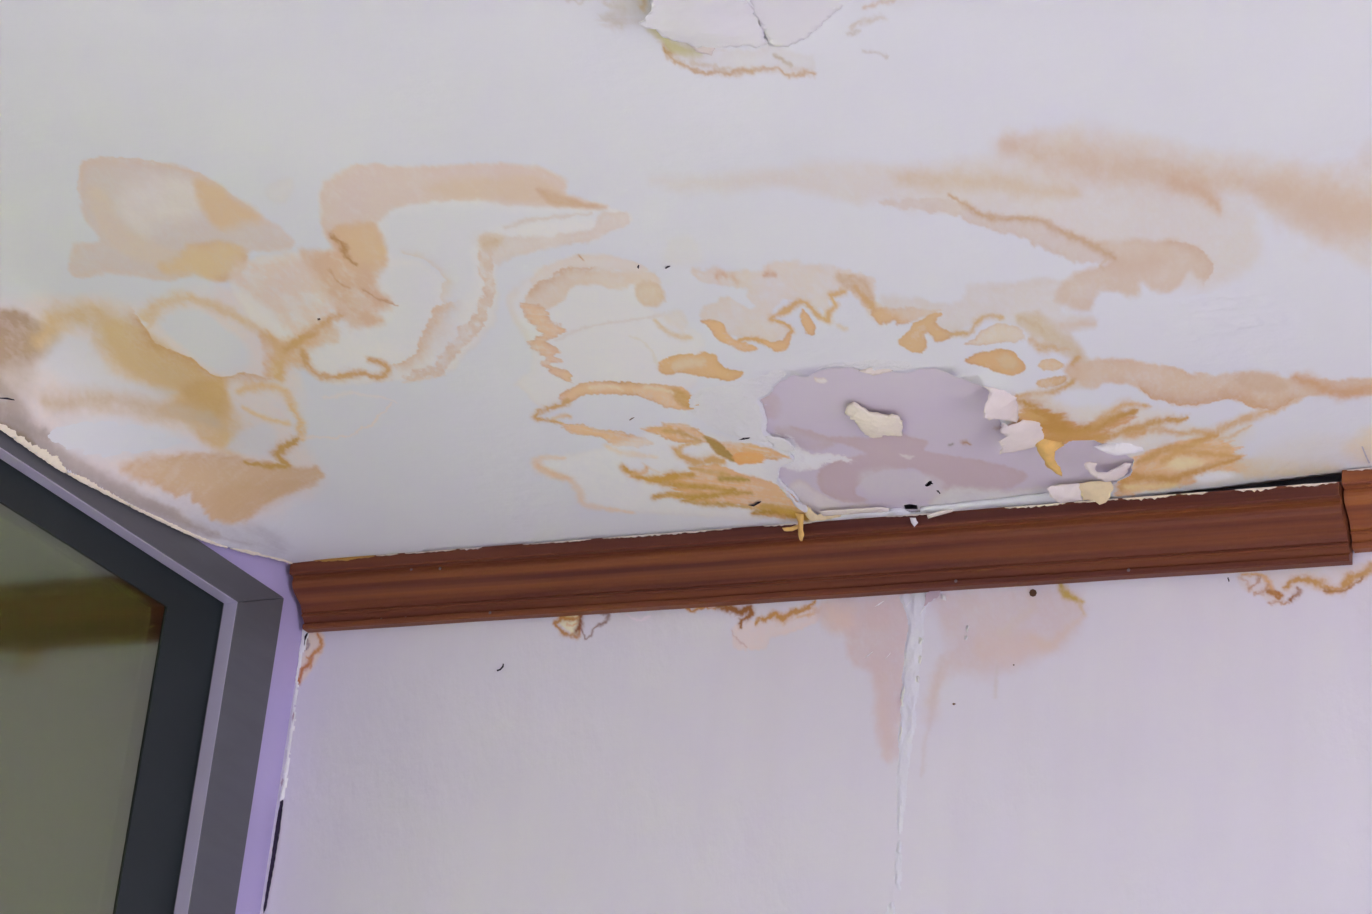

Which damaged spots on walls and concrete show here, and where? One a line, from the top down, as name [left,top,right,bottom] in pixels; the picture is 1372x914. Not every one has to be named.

water stain [560,0,820,82]
peeling [638,0,852,56]
water stain [834,0,947,62]
water stain [0,110,1372,559]
peeling [761,367,1144,541]
water stain [684,582,1097,780]
water stain [1233,557,1372,866]